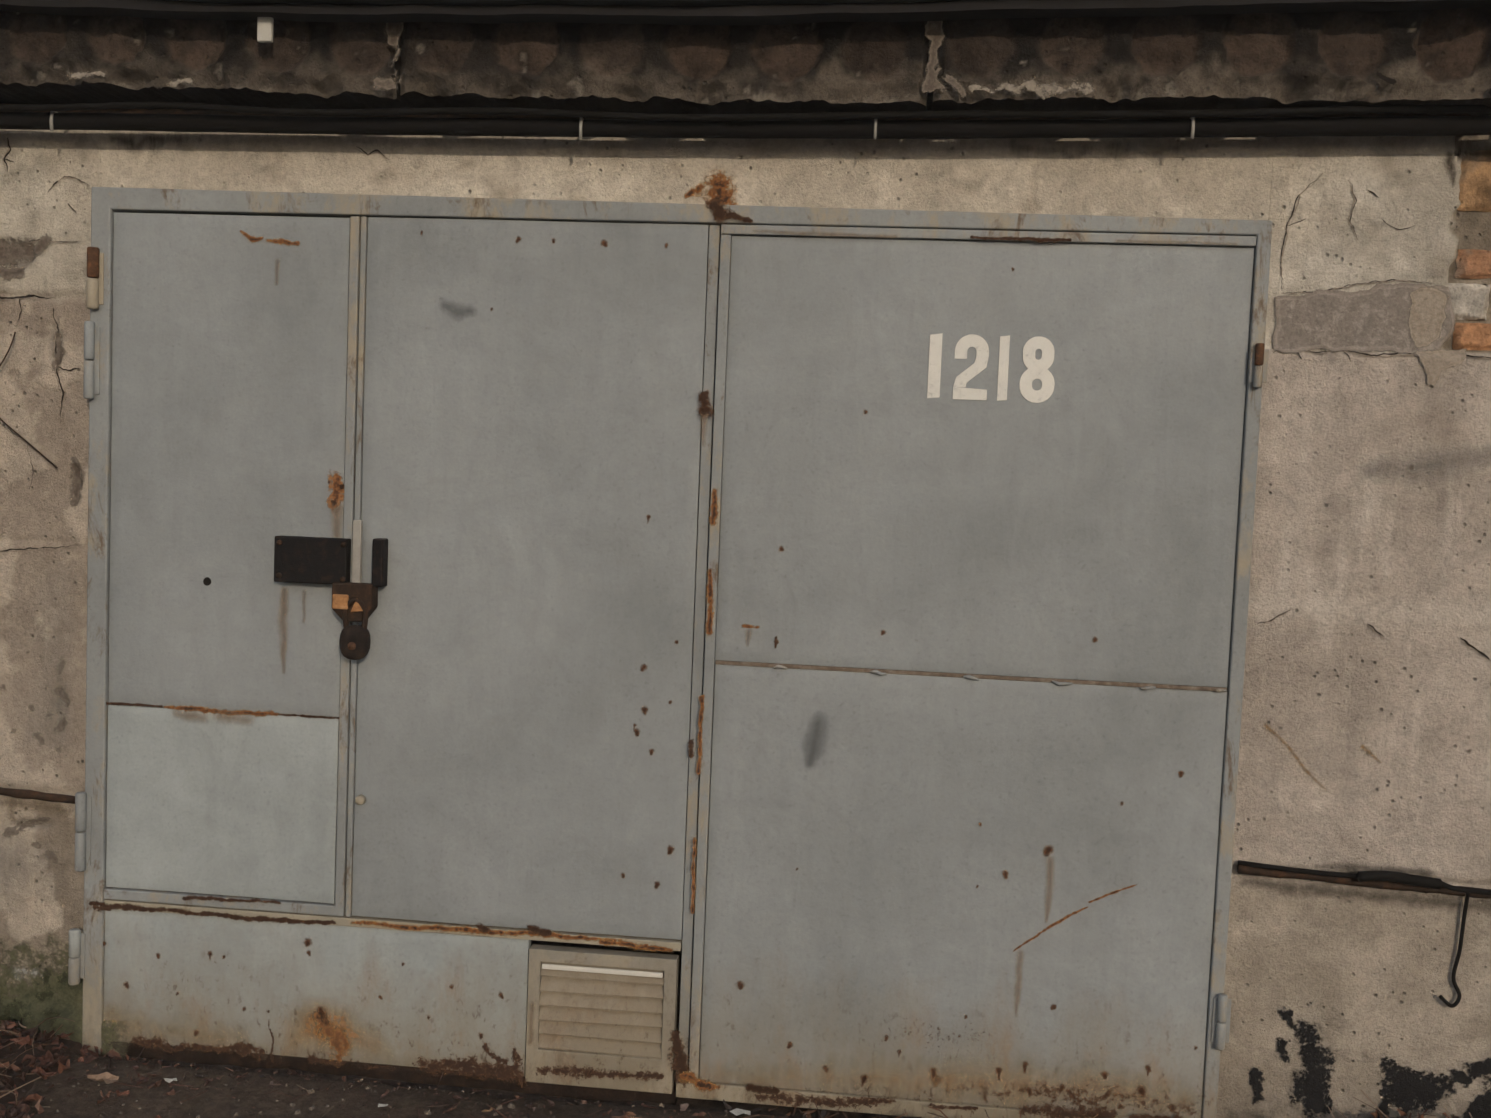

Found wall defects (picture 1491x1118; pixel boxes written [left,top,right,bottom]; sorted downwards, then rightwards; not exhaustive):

peeling [944,74,966,97]
crack [2,138,13,172]
crack [30,176,88,244]
corrosion [684,170,753,223]
flaking render [1457,150,1491,212]
flaking render [1448,249,1491,350]
crack [0,294,79,422]
crack [0,532,83,553]
corrosion [88,895,673,956]
corrosion [130,1010,274,1065]
corrosion [411,1030,723,1092]
corrosion [744,1061,1203,1118]